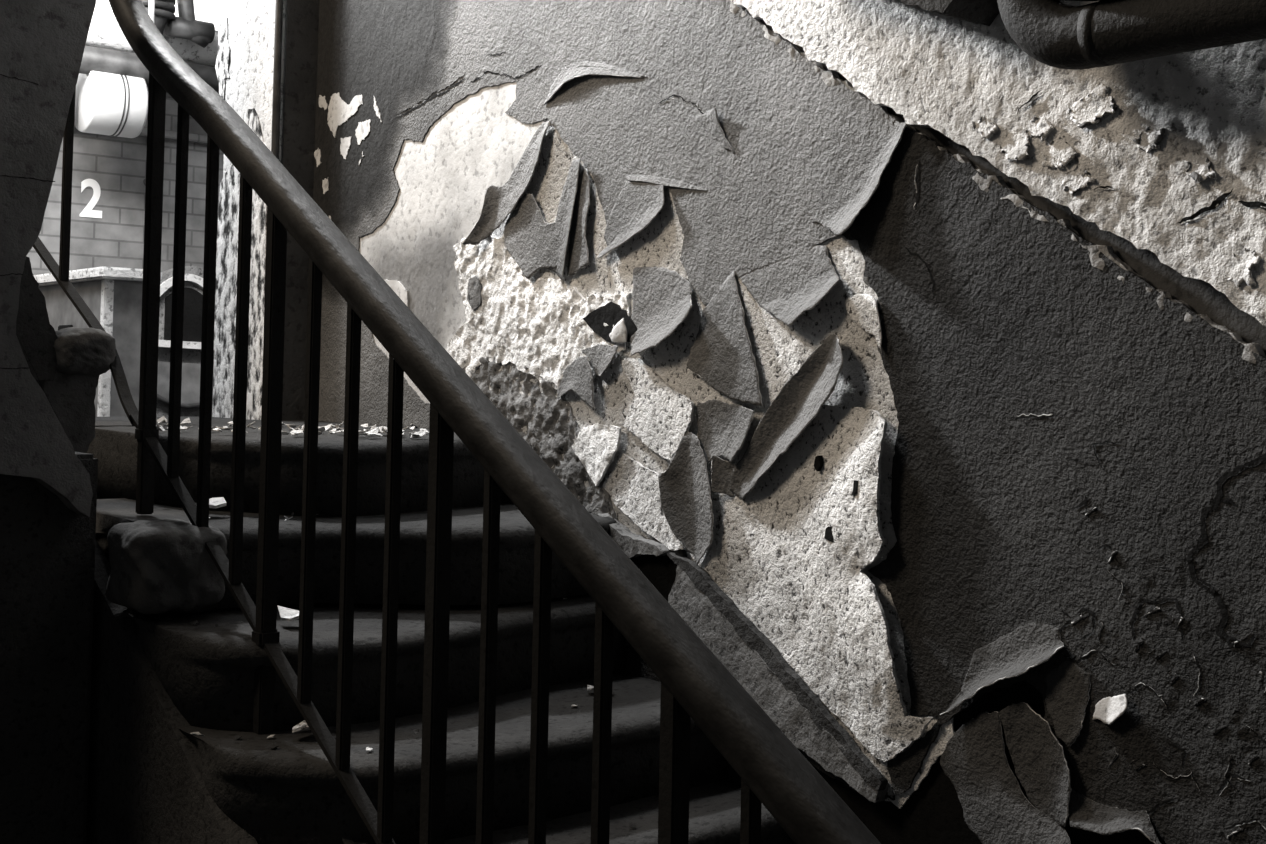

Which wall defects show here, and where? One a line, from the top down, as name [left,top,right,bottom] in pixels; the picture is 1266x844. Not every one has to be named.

peeling [314,148,329,194]
peeling [319,92,382,165]
spalling [359,0,1266,844]
crack [1059,455,1266,832]